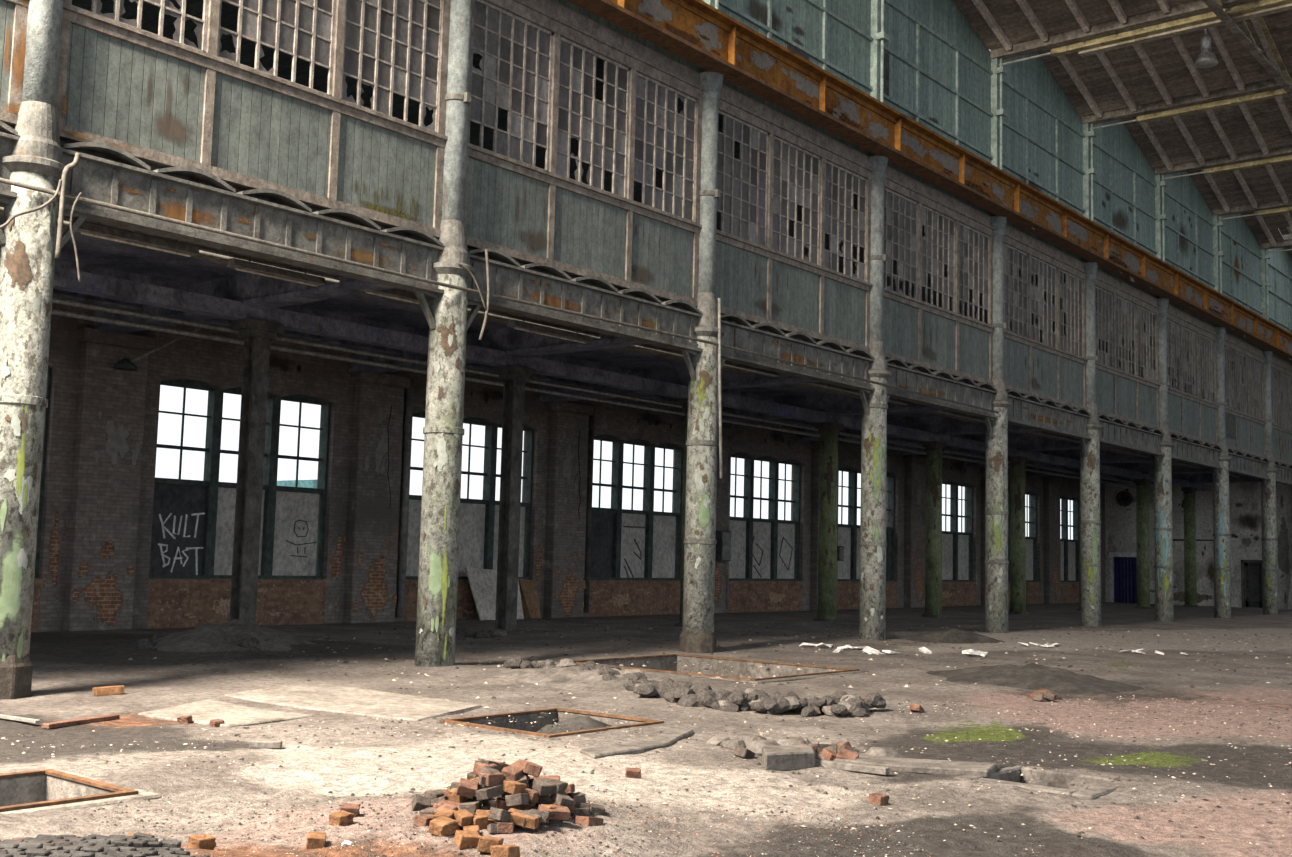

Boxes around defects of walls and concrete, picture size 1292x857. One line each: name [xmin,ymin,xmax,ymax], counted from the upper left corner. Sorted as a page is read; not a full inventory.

corrosion [4,26,26,87]
corrosion [645,12,720,55]
corrosion [6,103,20,114]
peeling [4,215,51,317]
peeling [436,316,465,401]
peeling [0,404,37,436]
peeling [433,433,461,472]
spalling [43,506,134,626]
peeling [419,532,454,638]